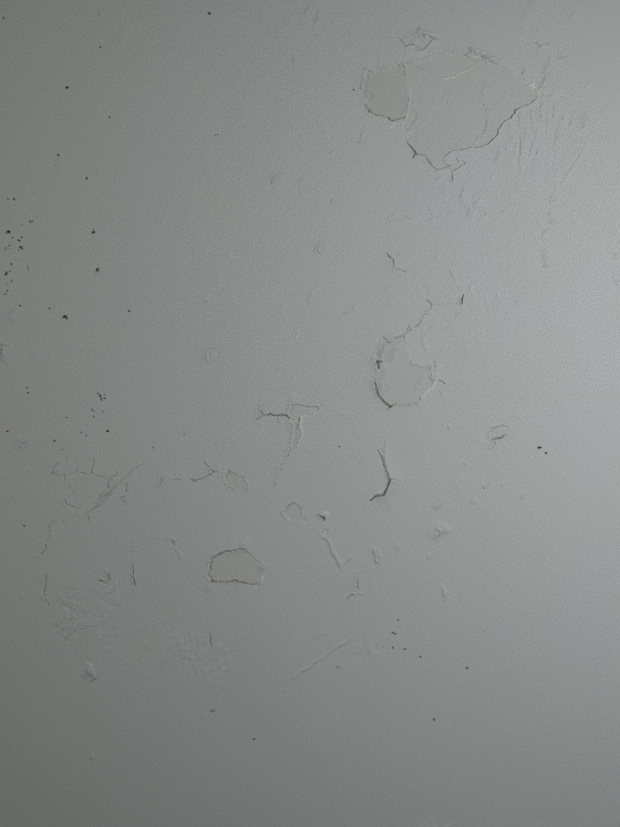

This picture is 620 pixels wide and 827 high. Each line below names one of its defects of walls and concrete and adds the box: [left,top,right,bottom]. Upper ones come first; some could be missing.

crack [363,438,411,510]